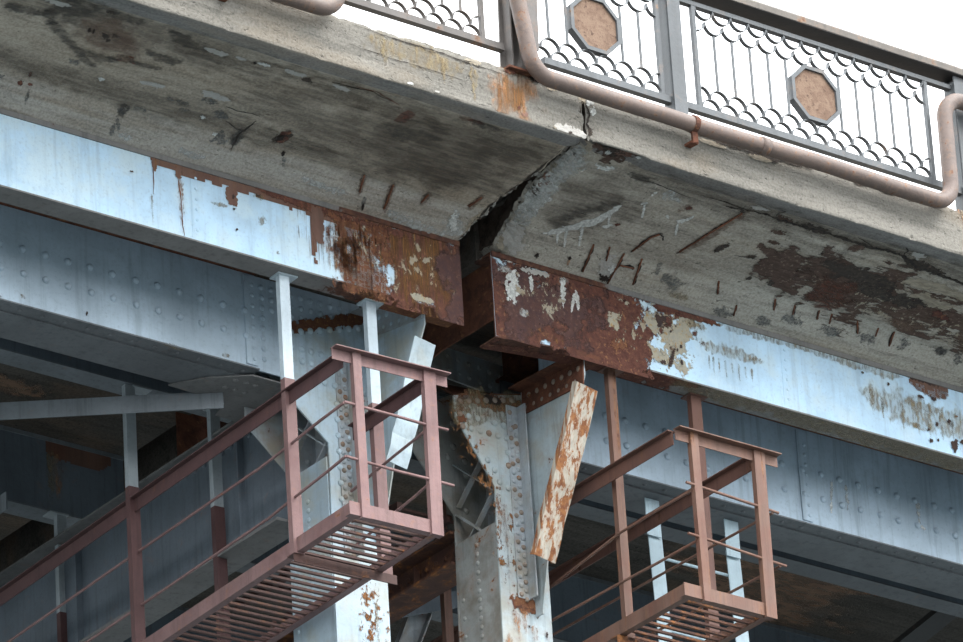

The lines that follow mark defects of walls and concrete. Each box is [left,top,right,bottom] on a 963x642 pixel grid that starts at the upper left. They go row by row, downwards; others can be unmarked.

damp [5,0,143,81]
damp [110,104,146,140]
damp [106,51,182,70]
corrosion [494,68,537,119]
crack [578,97,596,138]
corrosion [150,157,464,334]
damp [388,209,466,236]
spalling [677,210,963,355]
peeling [642,303,756,381]
corrosion [481,256,963,470]
corrosion [449,388,539,642]